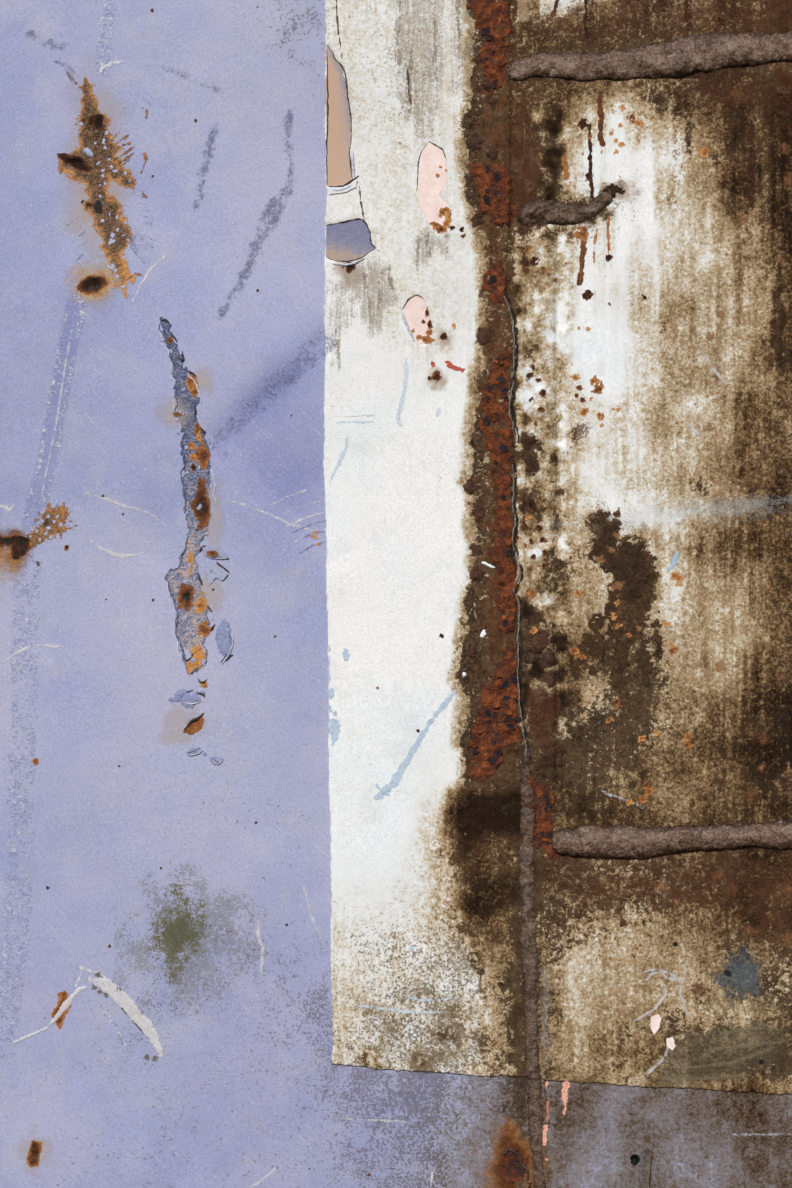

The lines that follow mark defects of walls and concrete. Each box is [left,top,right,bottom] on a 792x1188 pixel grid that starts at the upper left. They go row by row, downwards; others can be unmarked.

rust [56,61,153,303]
peeling [325,0,376,266]
peeling [416,141,452,234]
rust [561,95,644,201]
rust [573,216,613,300]
peeling [402,295,435,344]
peeling [157,317,230,688]
rust [467,343,561,783]
peeling [183,713,204,735]
spalling [13,966,107,1043]
rust [26,1140,42,1168]
rust [484,1119,550,1188]